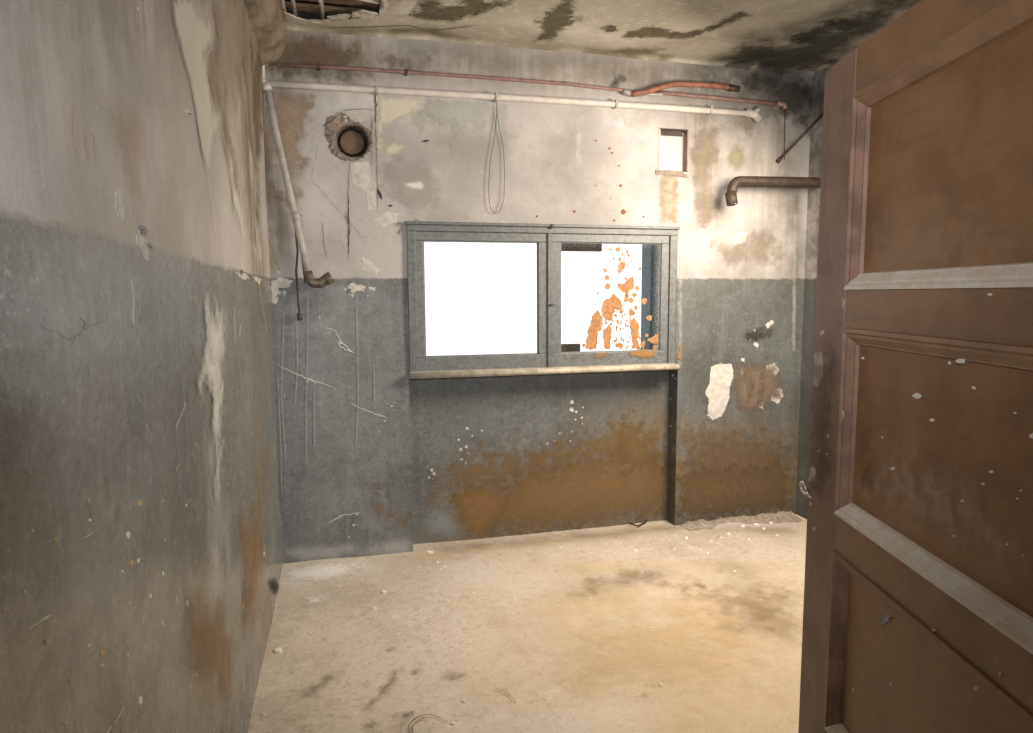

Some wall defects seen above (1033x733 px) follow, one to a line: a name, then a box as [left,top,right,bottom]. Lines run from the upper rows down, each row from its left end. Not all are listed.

damp [409,0,512,22]
damp [538,0,574,42]
damp [603,12,751,54]
spalling [324,111,399,227]
damp [691,129,718,226]
peeling [705,358,745,421]
peeling [759,361,783,409]